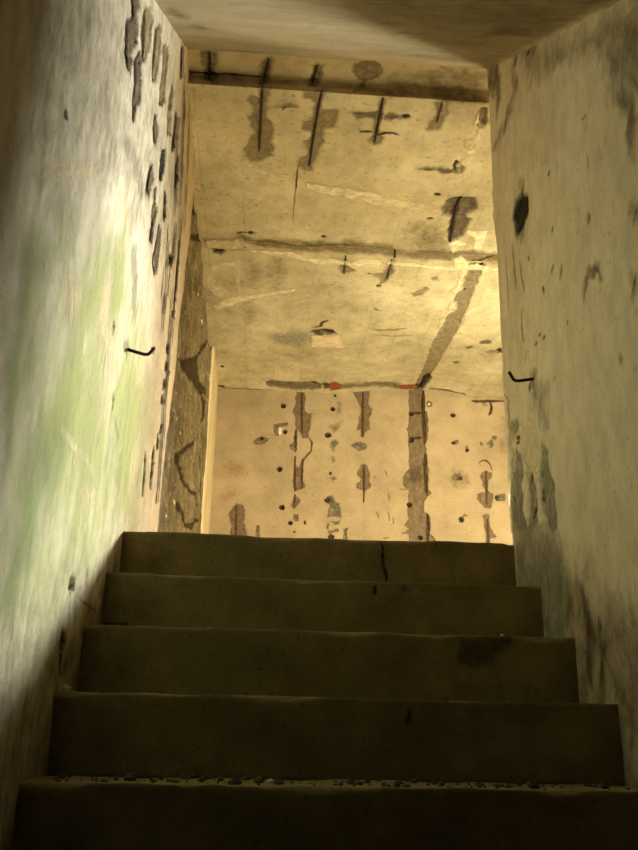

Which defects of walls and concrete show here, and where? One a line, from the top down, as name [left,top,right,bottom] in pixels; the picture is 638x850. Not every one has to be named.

flaking render [124,0,180,275]
spalling [243,58,274,161]
spalling [299,64,338,170]
spalling [360,98,410,145]
crack [141,71,263,529]
flaking render [253,380,342,444]
flaking render [351,391,371,450]
flaking render [395,196,486,541]
flaking render [229,504,260,537]
crack [373,542,387,595]
peeling [478,420,556,543]